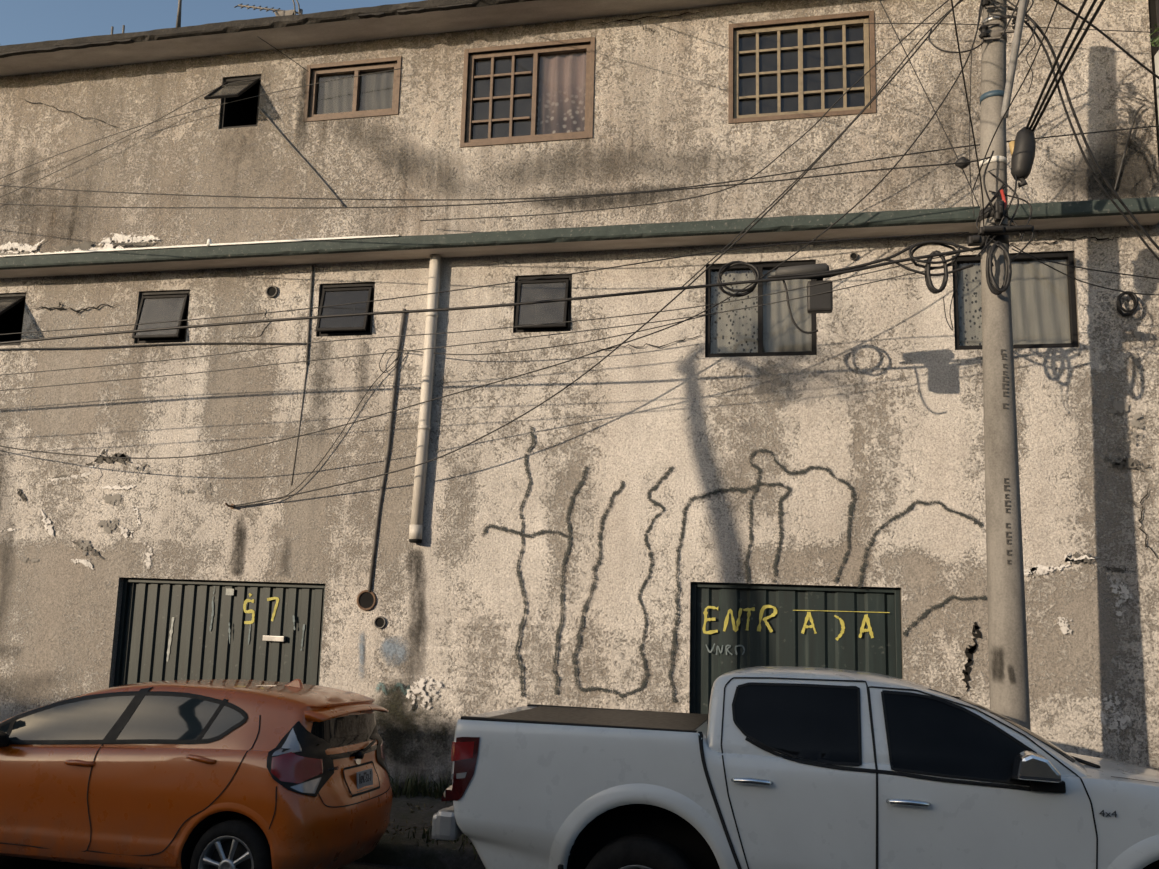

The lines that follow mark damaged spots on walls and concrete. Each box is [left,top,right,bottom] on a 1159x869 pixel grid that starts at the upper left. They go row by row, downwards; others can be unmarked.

water stain [1064,135,1157,197]
water stain [541,188,668,207]
peeling [0,232,160,256]
flaking render [48,448,159,482]
peeling [41,510,54,537]
peeling [71,539,103,569]
peeling [97,485,153,571]
water stain [410,551,424,650]
peeling [1053,617,1074,637]
peeling [1024,552,1134,616]
crack [1132,488,1159,559]
water stain [375,668,451,762]